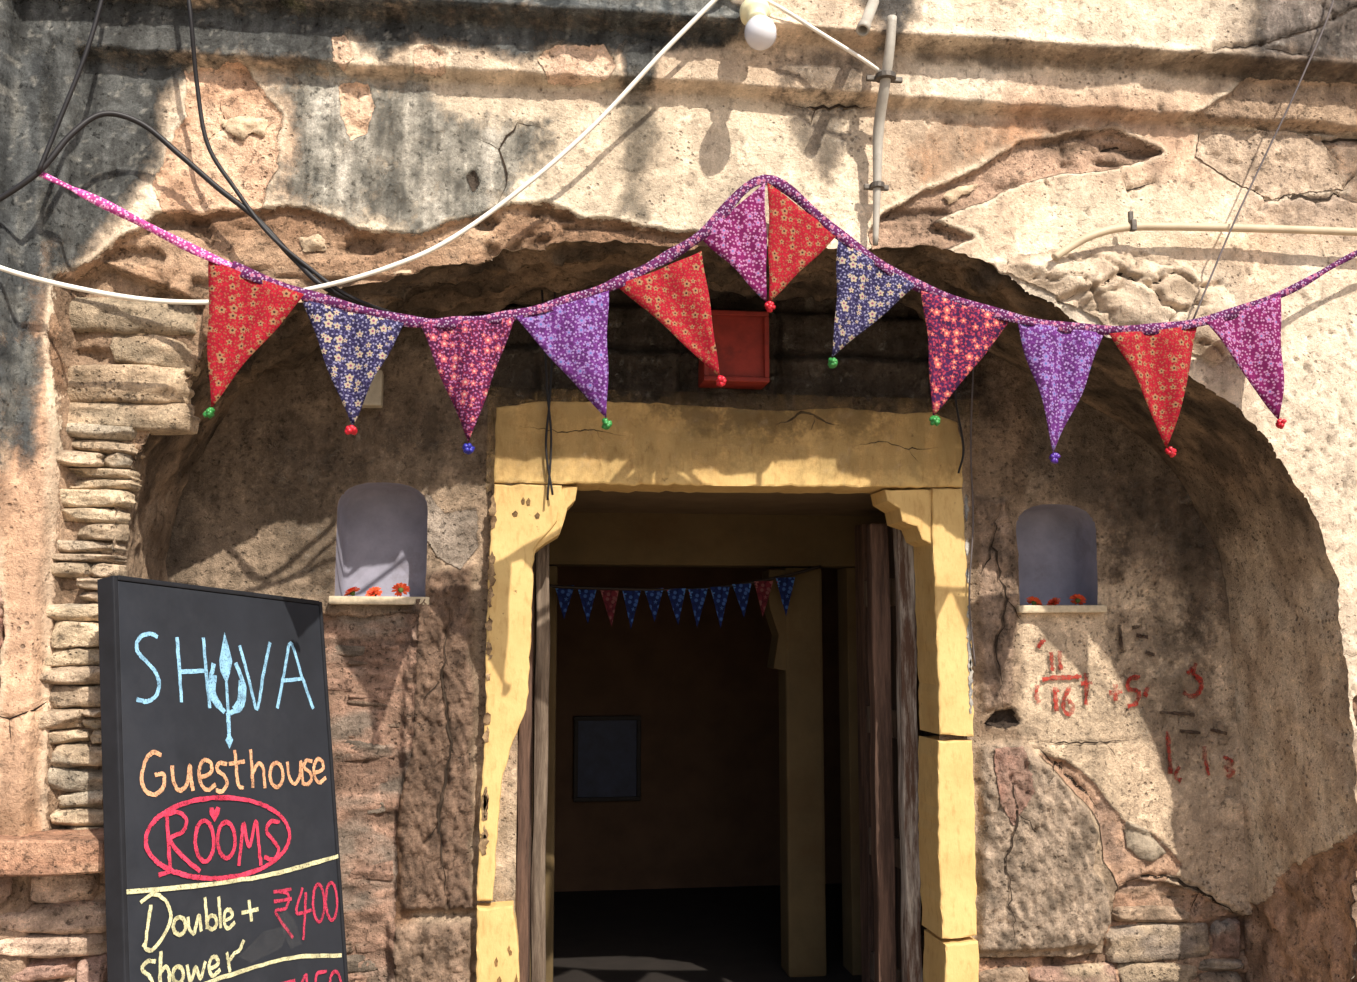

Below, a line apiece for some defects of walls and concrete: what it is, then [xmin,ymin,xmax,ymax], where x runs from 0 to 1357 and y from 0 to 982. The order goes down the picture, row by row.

leakage [778,55,859,94]
crack [1194,5,1357,58]
leakage [0,0,745,461]
leakage [791,107,846,177]
flaking render [869,129,1162,249]
crack [1260,134,1357,208]
flaking render [37,58,708,830]
crack [981,498,1020,706]
crack [423,609,454,905]
flaking render [985,709,1020,730]
peeling [478,787,489,855]
flaking render [978,746,1357,982]